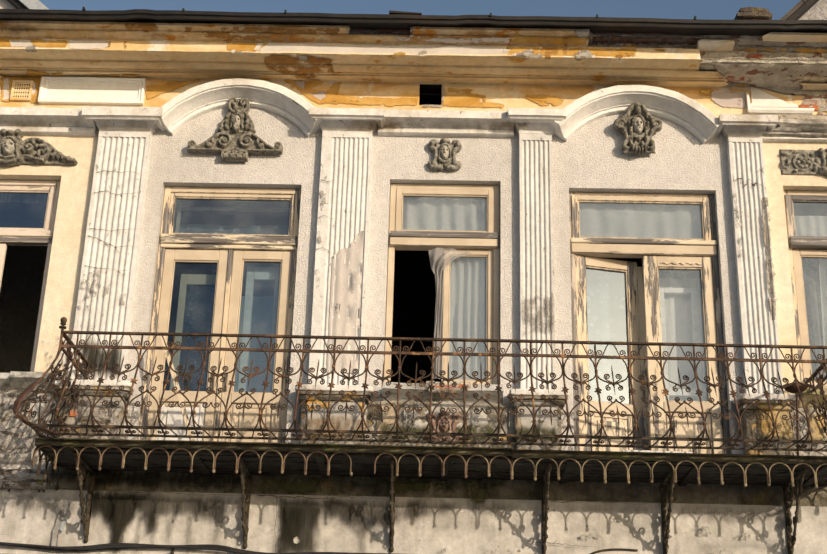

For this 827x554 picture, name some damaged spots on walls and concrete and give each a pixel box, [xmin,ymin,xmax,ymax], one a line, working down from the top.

peeling [0,69,63,103]
peeling [0,38,111,52]
peeling [146,79,200,99]
spalling [226,26,827,116]
peeling [327,230,365,373]
spalling [0,386,39,453]
water stain [54,470,241,550]
water stain [261,477,430,553]